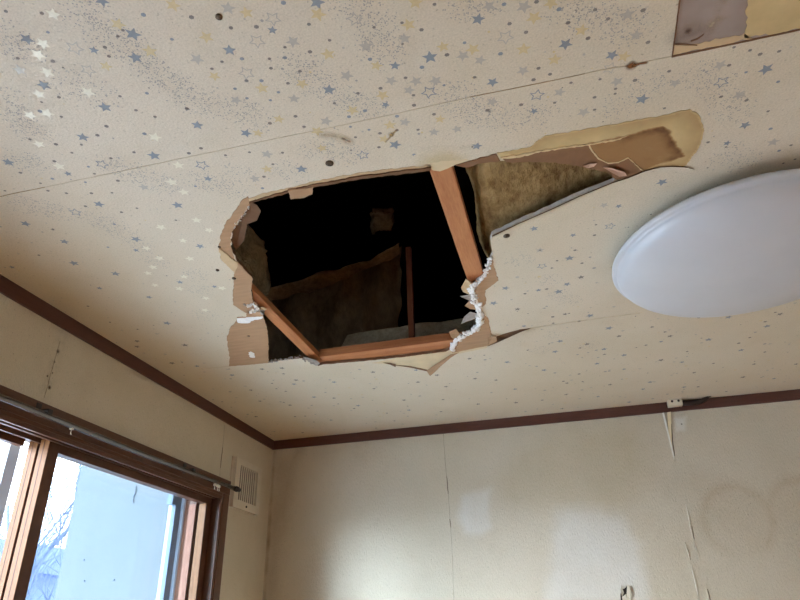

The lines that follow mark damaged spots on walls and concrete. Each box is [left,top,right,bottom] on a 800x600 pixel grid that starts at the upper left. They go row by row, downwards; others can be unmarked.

peeling [672,0,800,58]
peeling [219,109,704,376]
crack [684,506,711,600]